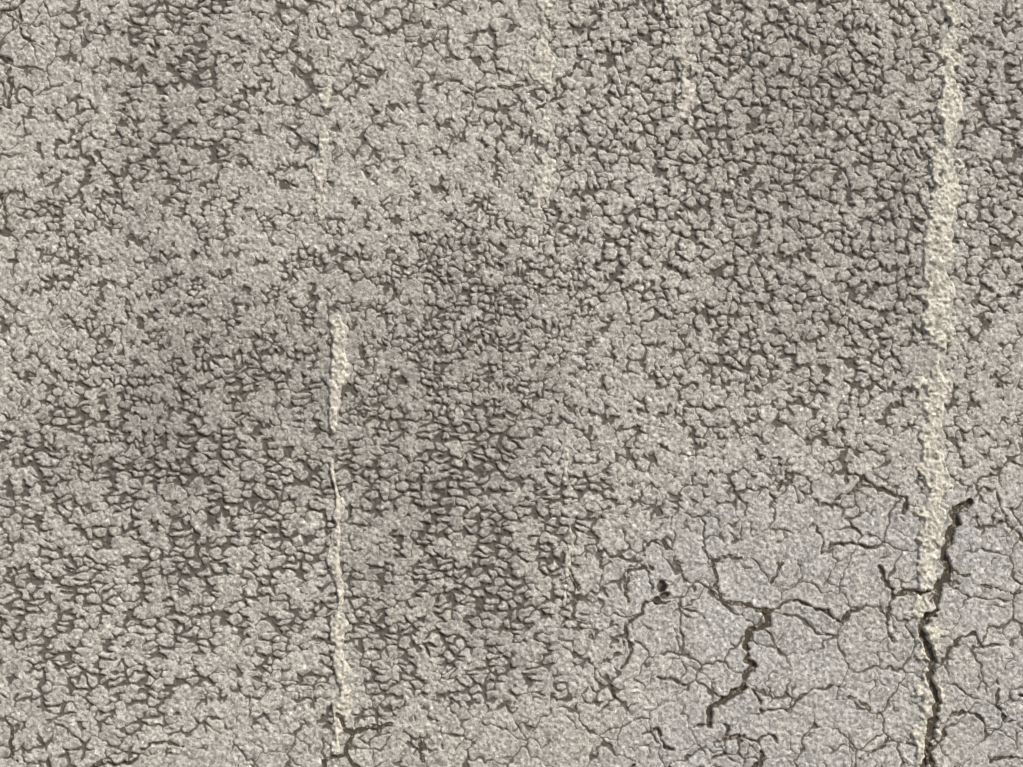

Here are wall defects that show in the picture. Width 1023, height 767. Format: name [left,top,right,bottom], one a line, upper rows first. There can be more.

crack [0,0,32,42]
crack [0,57,14,110]
crack [777,459,813,490]
crack [815,475,1023,767]
crack [601,538,871,767]
crack [8,726,19,762]
crack [92,741,184,767]
crack [322,713,393,767]
crack [418,739,426,763]